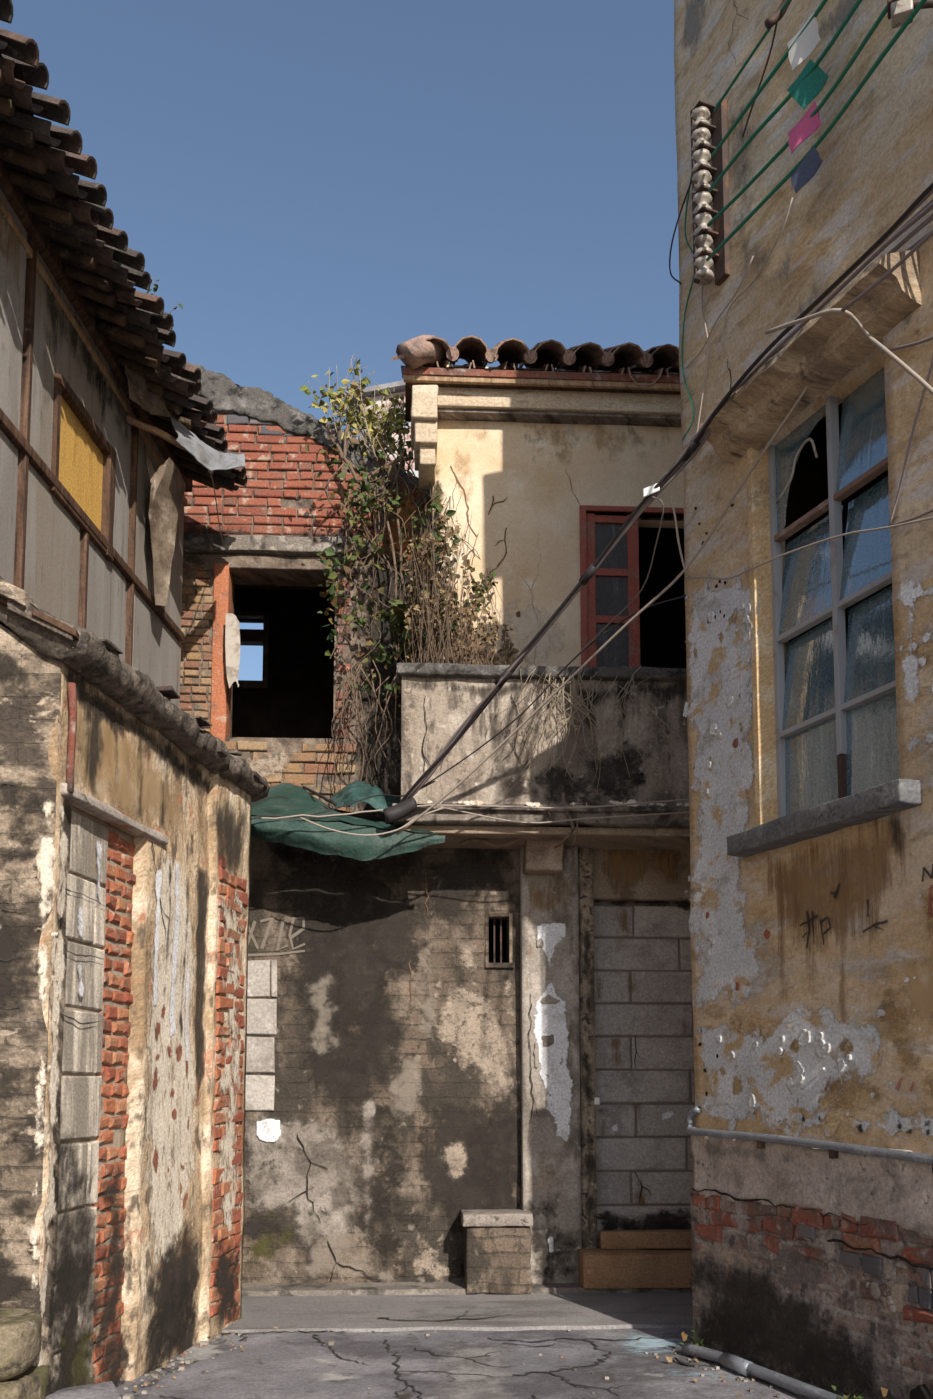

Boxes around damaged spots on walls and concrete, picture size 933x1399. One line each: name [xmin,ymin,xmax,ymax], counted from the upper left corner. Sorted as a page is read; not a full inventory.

damp [0,781,45,874]
damp [526,741,689,807]
peeling [683,565,933,1137]
damp [768,820,900,949]
damp [0,1063,36,1098]
flaking render [209,855,248,1324]
damp [278,849,691,1279]
peeling [533,994,572,1068]
damp [0,1200,34,1308]
crack [220,1307,692,1399]
damp [624,1242,888,1399]
flaking render [693,1195,933,1324]